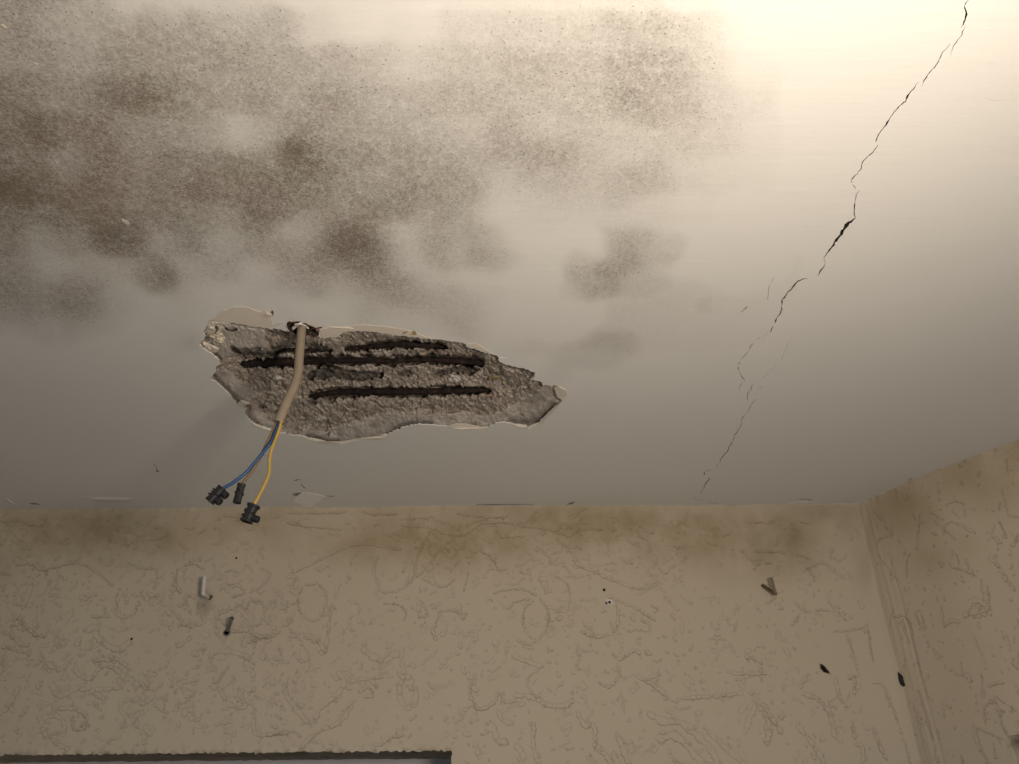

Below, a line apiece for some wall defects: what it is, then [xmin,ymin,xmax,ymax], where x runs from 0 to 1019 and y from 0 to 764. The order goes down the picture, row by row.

mould [0,1,706,323]
spalling [200,306,567,444]
crack [701,2,967,505]